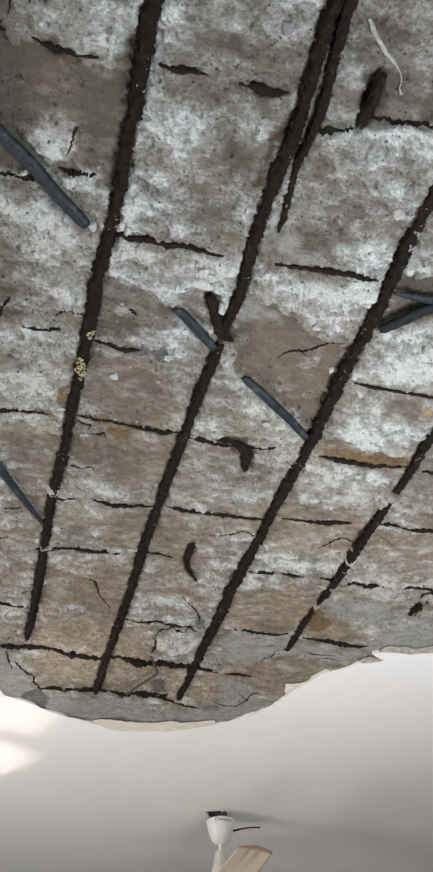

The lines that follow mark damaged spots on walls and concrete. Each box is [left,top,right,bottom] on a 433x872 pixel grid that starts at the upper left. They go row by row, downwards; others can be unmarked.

spalling [0,0,74,51]
spalling [0,31,138,188]
spalling [230,0,433,433]
spalling [0,308,31,326]
corrosion [56,384,72,404]
crack [75,420,107,439]
corrosion [326,449,419,471]
spalling [266,502,363,563]
crack [6,652,41,691]
spalling [0,647,102,724]
spalling [252,652,319,696]
peeling [379,646,433,655]